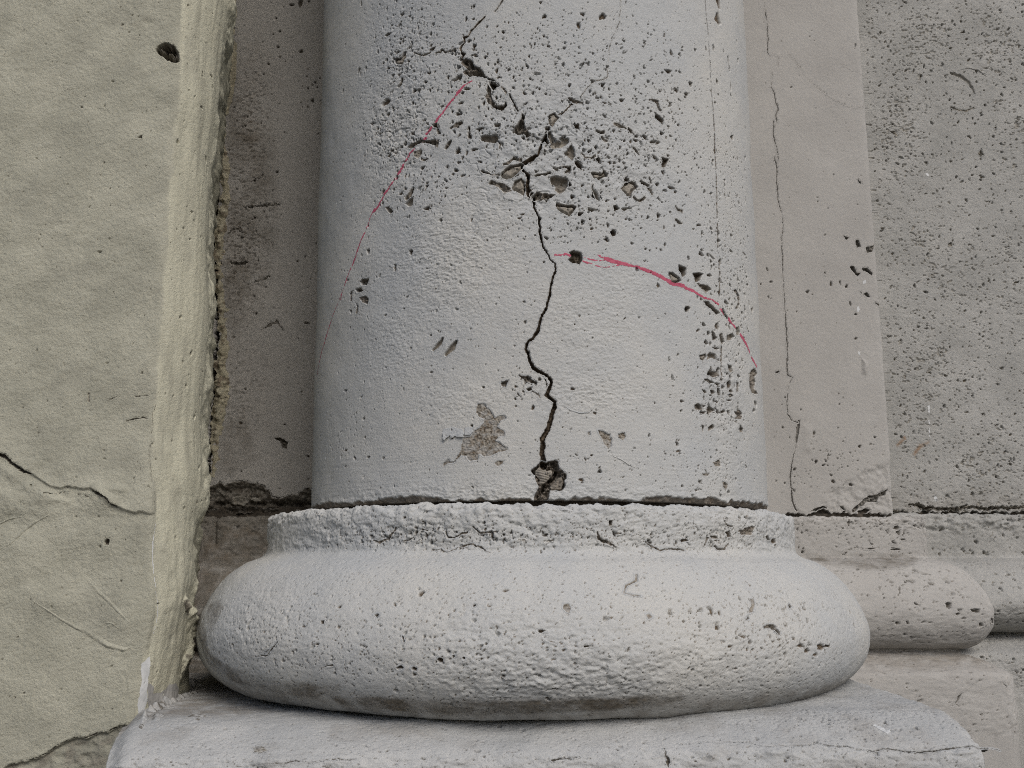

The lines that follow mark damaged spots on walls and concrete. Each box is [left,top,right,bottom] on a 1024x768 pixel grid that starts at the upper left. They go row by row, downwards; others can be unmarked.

crack [458,0,505,61]
spalling [394,46,508,112]
crack [486,75,520,113]
spalling [406,120,472,162]
crack [521,0,622,462]
crack [763,0,801,513]
spalling [499,374,542,400]
peeling [442,402,509,468]
peeling [586,428,638,469]
crack [0,452,118,509]
spalling [208,480,312,512]
spalling [530,459,569,501]